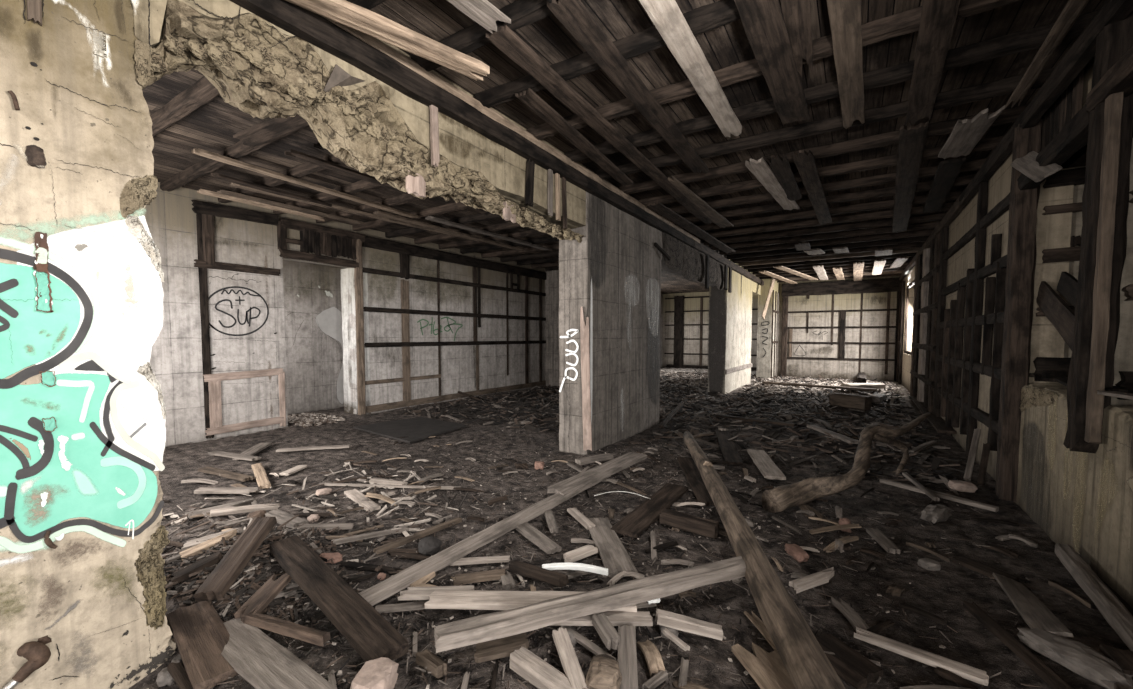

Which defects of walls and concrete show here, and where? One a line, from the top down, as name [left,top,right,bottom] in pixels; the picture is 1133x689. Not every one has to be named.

spalling [140,0,584,243]
corrosion [33,232,54,313]